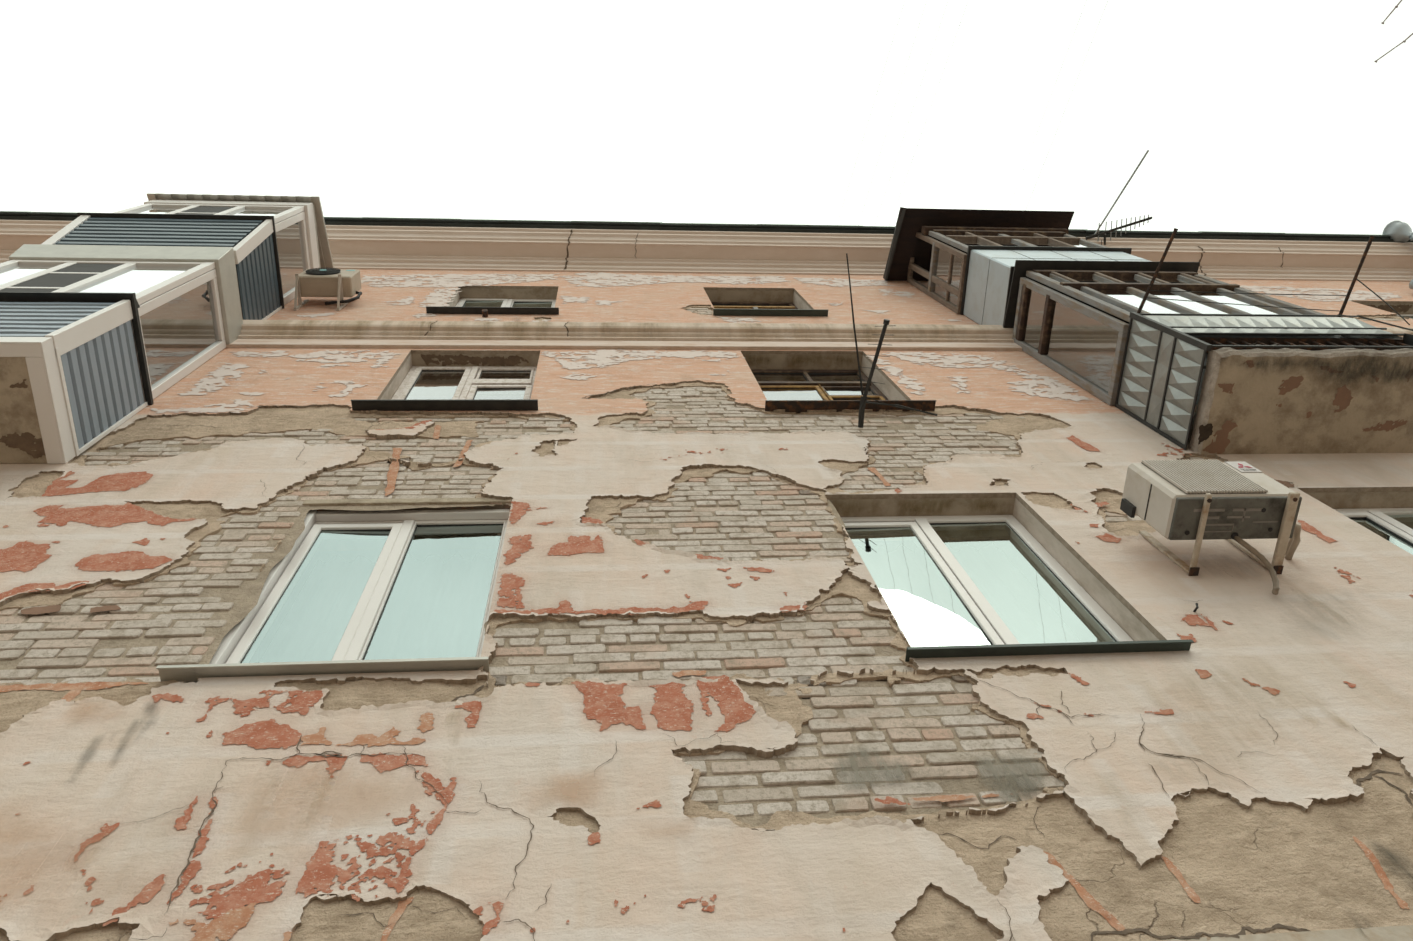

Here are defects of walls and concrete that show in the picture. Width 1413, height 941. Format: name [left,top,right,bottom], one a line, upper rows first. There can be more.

crack [564,230,573,270]
flaking render [0,349,1413,941]
crack [972,676,1278,793]
crack [1352,725,1413,805]
crack [121,735,550,941]